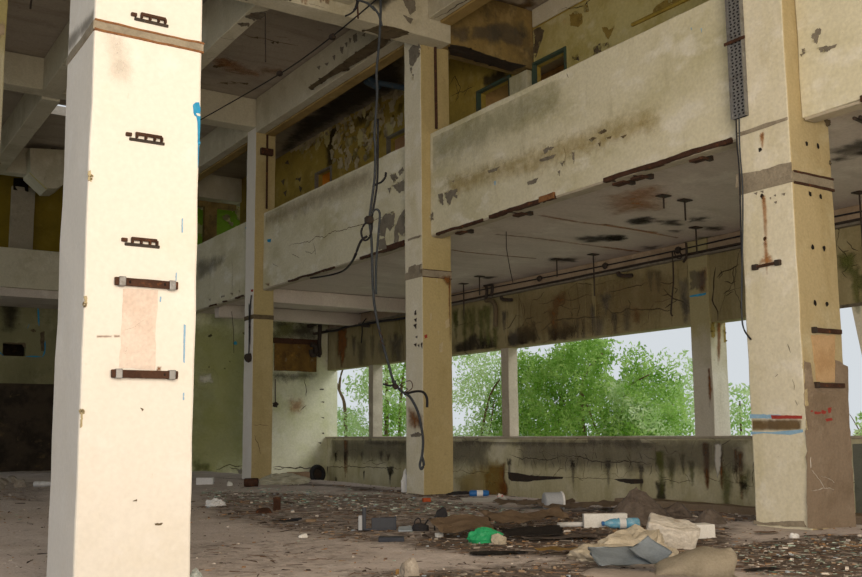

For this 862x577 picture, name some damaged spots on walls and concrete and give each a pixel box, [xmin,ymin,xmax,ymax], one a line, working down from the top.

spalling [308,0,416,90]
peeling [409,44,421,80]
peeling [800,28,837,57]
crack [836,229,862,278]
leakage [455,307,537,352]
mould [548,326,575,340]
crack [505,266,689,345]
crack [453,435,754,486]
leakage [656,453,693,499]
leakage [715,444,730,501]